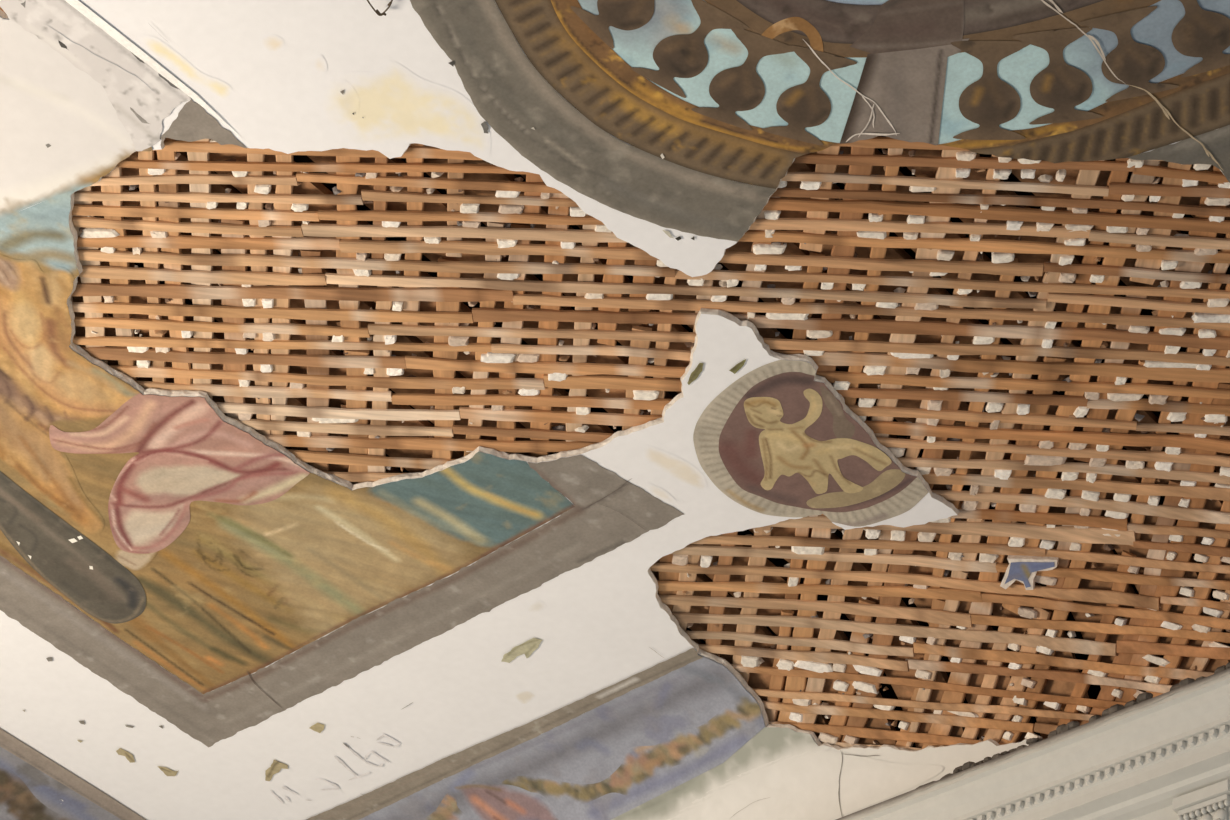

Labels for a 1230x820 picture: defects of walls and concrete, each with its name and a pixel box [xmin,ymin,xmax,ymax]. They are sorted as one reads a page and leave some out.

crack [1041,0,1224,171]
flaking render [67,136,1230,752]
peeling [265,760,288,781]